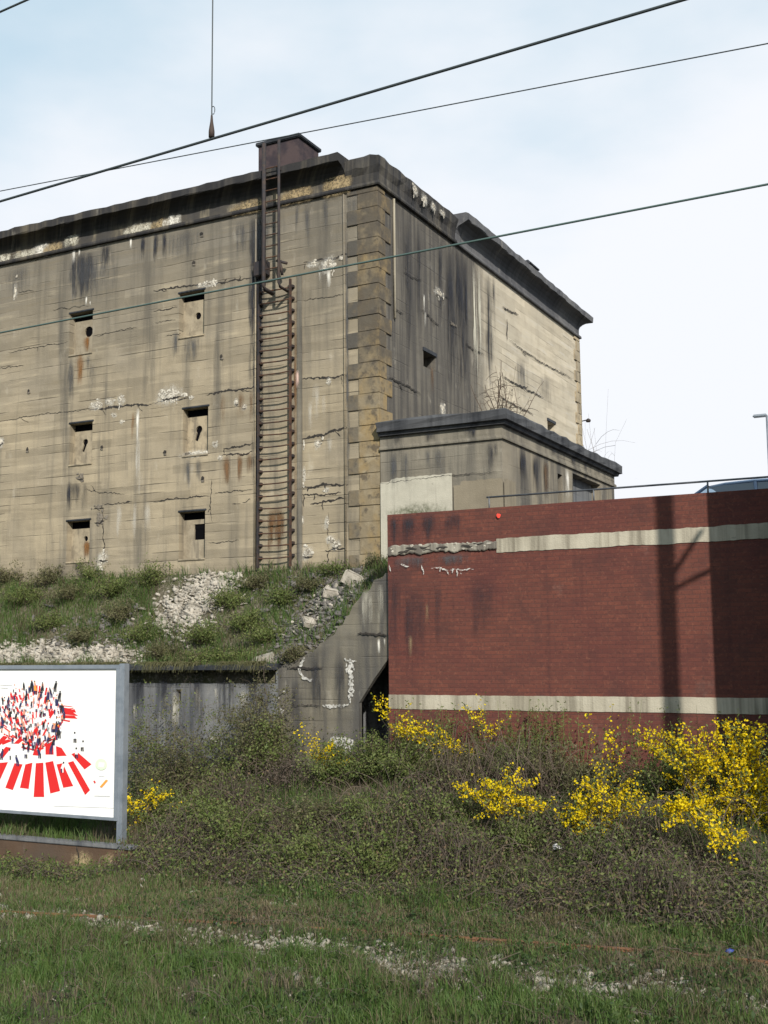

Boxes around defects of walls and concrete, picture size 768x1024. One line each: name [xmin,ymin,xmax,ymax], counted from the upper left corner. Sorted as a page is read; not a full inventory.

damp [30,236,108,302]
damp [439,255,494,377]
spalling [91,395,125,423]
crack [7,386,254,421]
spalling [158,387,194,405]
crack [302,482,348,563]
spalling [388,540,497,556]